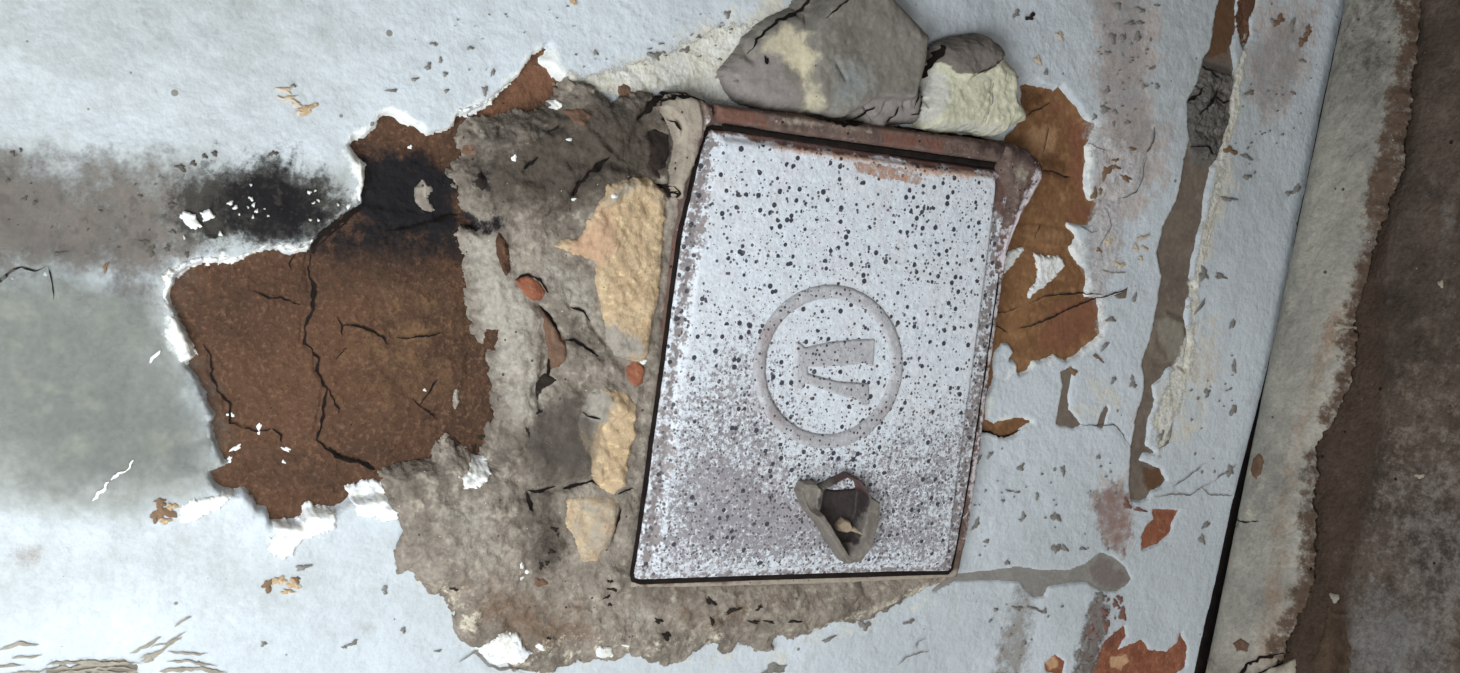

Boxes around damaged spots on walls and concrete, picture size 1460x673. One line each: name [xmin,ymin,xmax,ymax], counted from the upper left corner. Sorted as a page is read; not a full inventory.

spalling [1270,13,1312,79]
spalling [103,11,759,594]
spalling [987,0,1302,549]
crack [203,205,457,470]
spalling [977,409,1030,464]
spalling [971,463,1089,556]
flaking render [0,617,227,673]
flaking render [475,632,533,665]
flaking render [596,645,614,658]
spalling [762,662,787,673]
spalling [988,604,1064,659]
spalling [1045,592,1187,673]